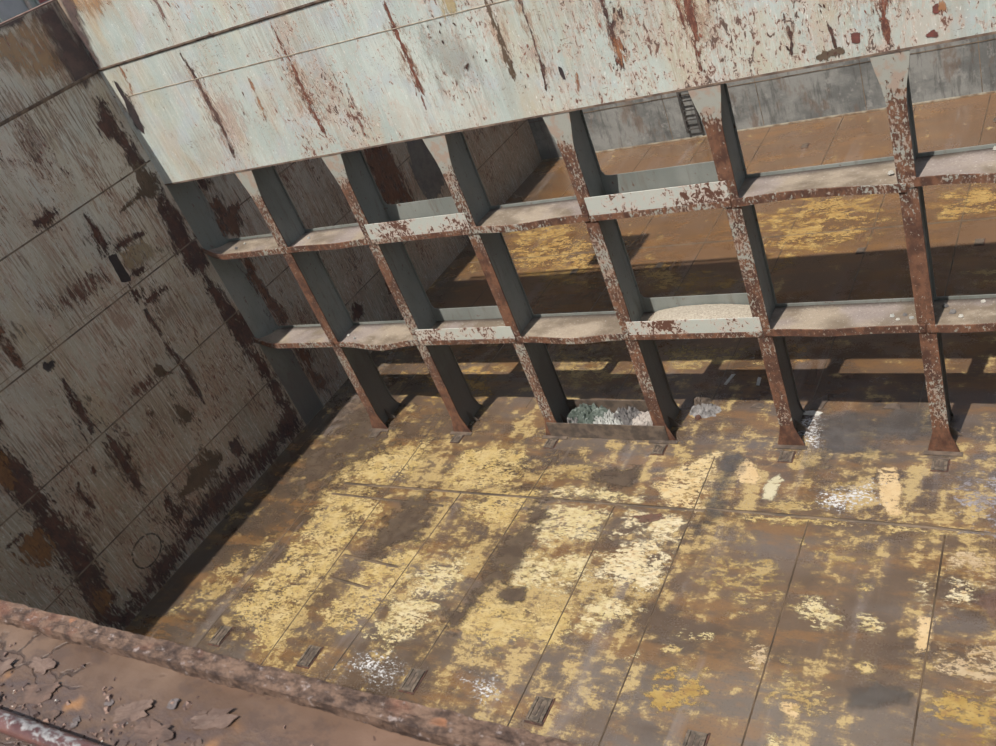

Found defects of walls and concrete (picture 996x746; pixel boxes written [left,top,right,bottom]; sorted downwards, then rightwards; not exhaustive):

corrosion [0,0,110,88]
corrosion [382,1,427,110]
corrosion [484,0,516,80]
corrosion [675,0,705,76]
corrosion [816,19,845,61]
corrosion [864,0,891,45]
corrosion [180,53,237,158]
corrosion [363,145,415,204]
corrosion [36,96,302,444]
corrosion [0,420,125,628]
damp [816,478,887,511]
damp [952,471,996,537]